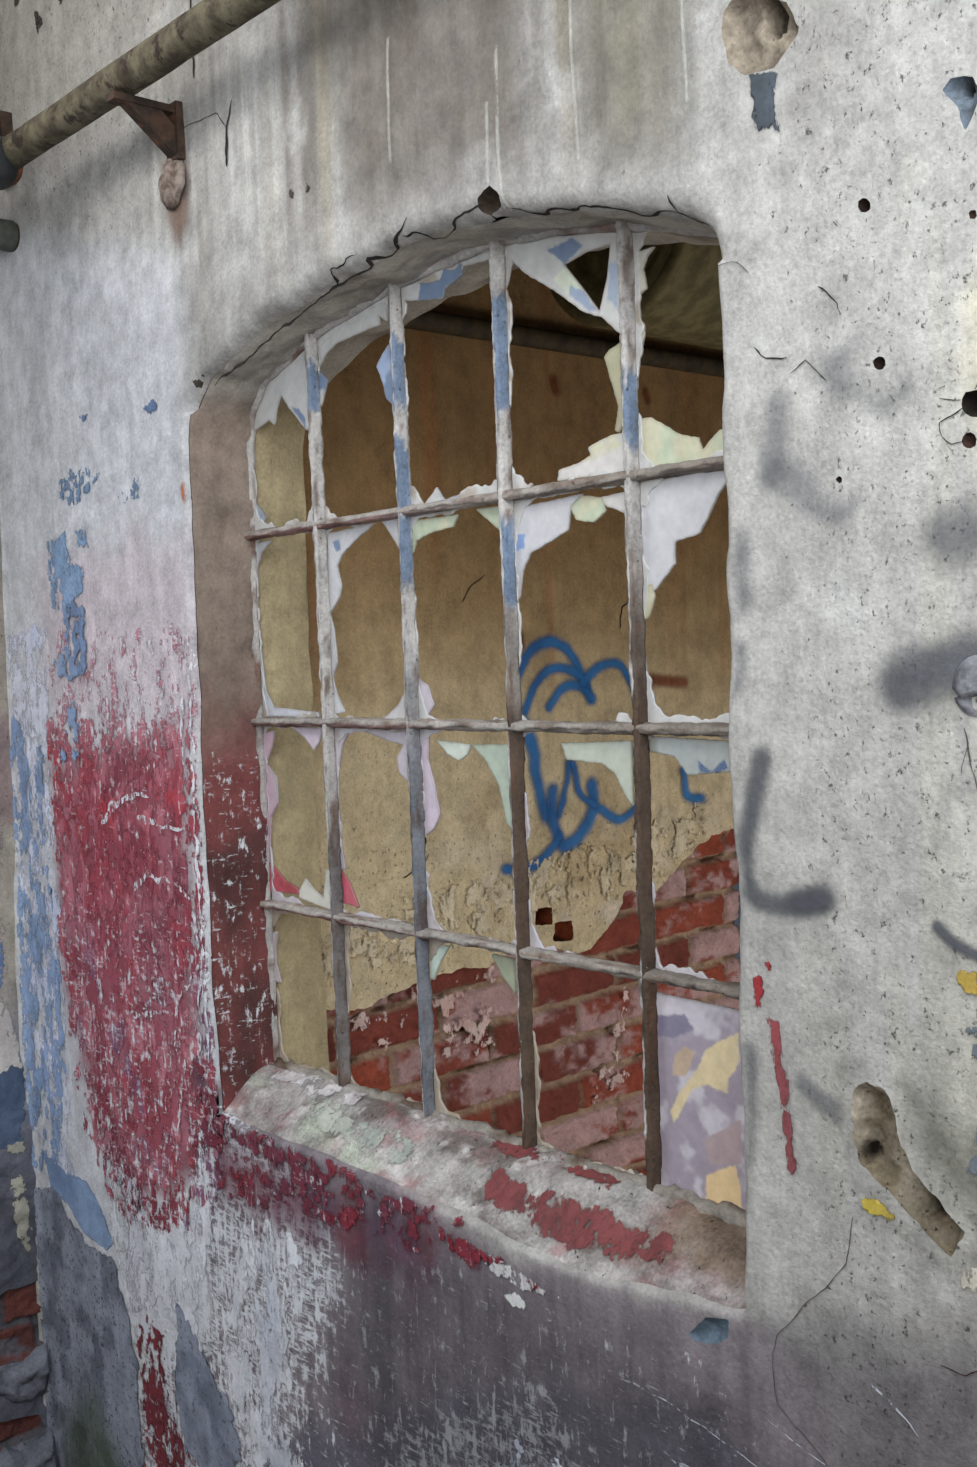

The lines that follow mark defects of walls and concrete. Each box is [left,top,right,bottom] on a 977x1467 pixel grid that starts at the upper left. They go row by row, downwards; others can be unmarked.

flaking render [721,0,799,75]
crack [214,195,713,386]
crack [754,347,825,380]
peeling [0,530,563,1467]
flaking render [271,801,741,1265]
peeling [965,1027,977,1058]
flaking render [850,1082,965,1257]
peeling [960,1267,977,1292]
flaking render [689,1317,729,1345]